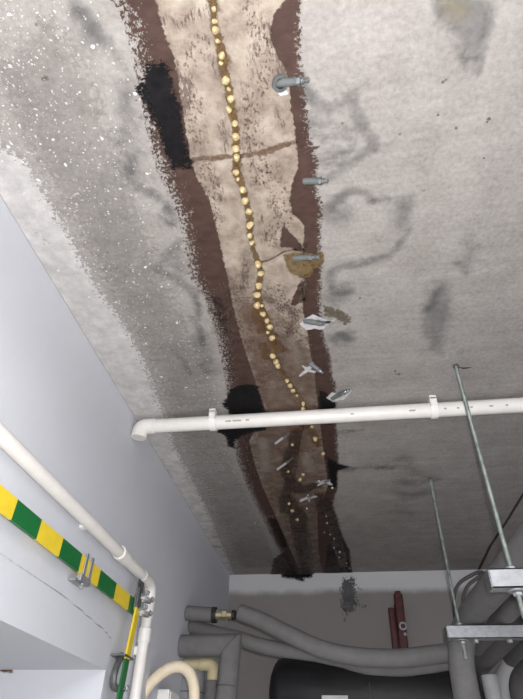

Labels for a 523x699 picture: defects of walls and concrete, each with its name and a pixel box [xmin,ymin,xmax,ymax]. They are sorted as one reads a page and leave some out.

peeling [0,0,173,422]
spalling [154,0,318,413]
rust [184,141,295,163]
crack [207,0,325,541]
rust [284,252,324,299]
rust [322,305,352,325]
peeling [147,432,256,574]
spalling [236,424,328,573]
leakage [279,432,367,621]